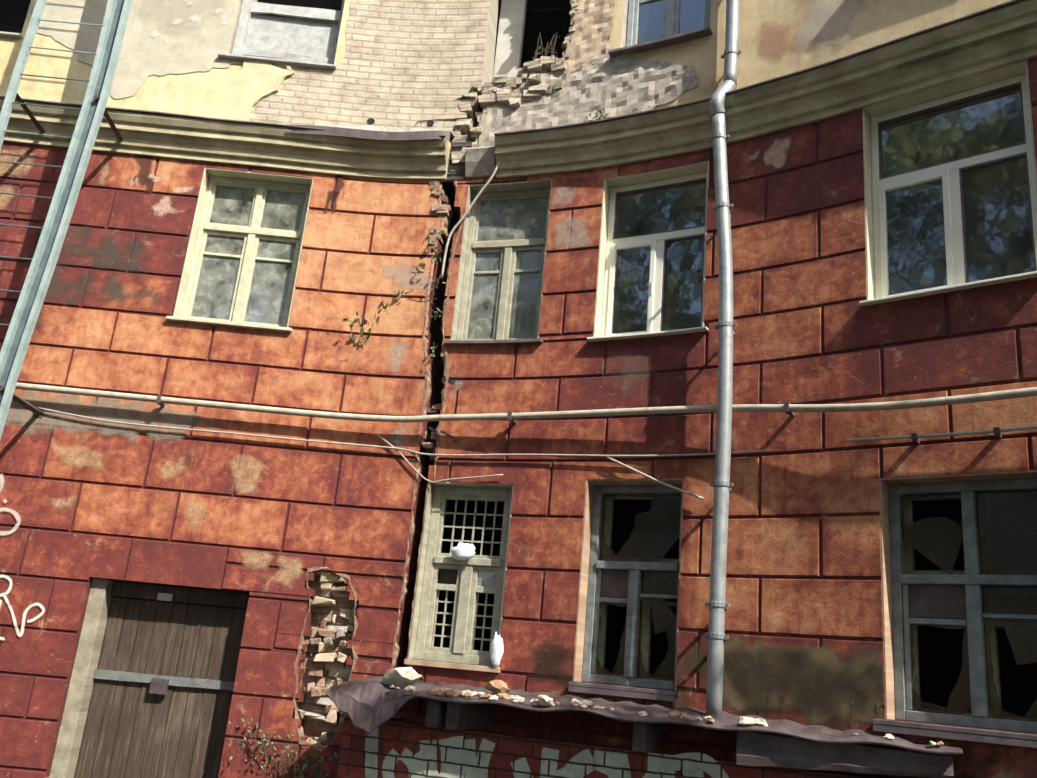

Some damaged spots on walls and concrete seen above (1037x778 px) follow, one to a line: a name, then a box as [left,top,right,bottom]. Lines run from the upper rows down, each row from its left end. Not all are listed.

peeling [28,0,110,66]
peeling [110,0,699,147]
crack [388,86,493,669]
spalling [244,552,359,752]
water stain [722,638,885,727]